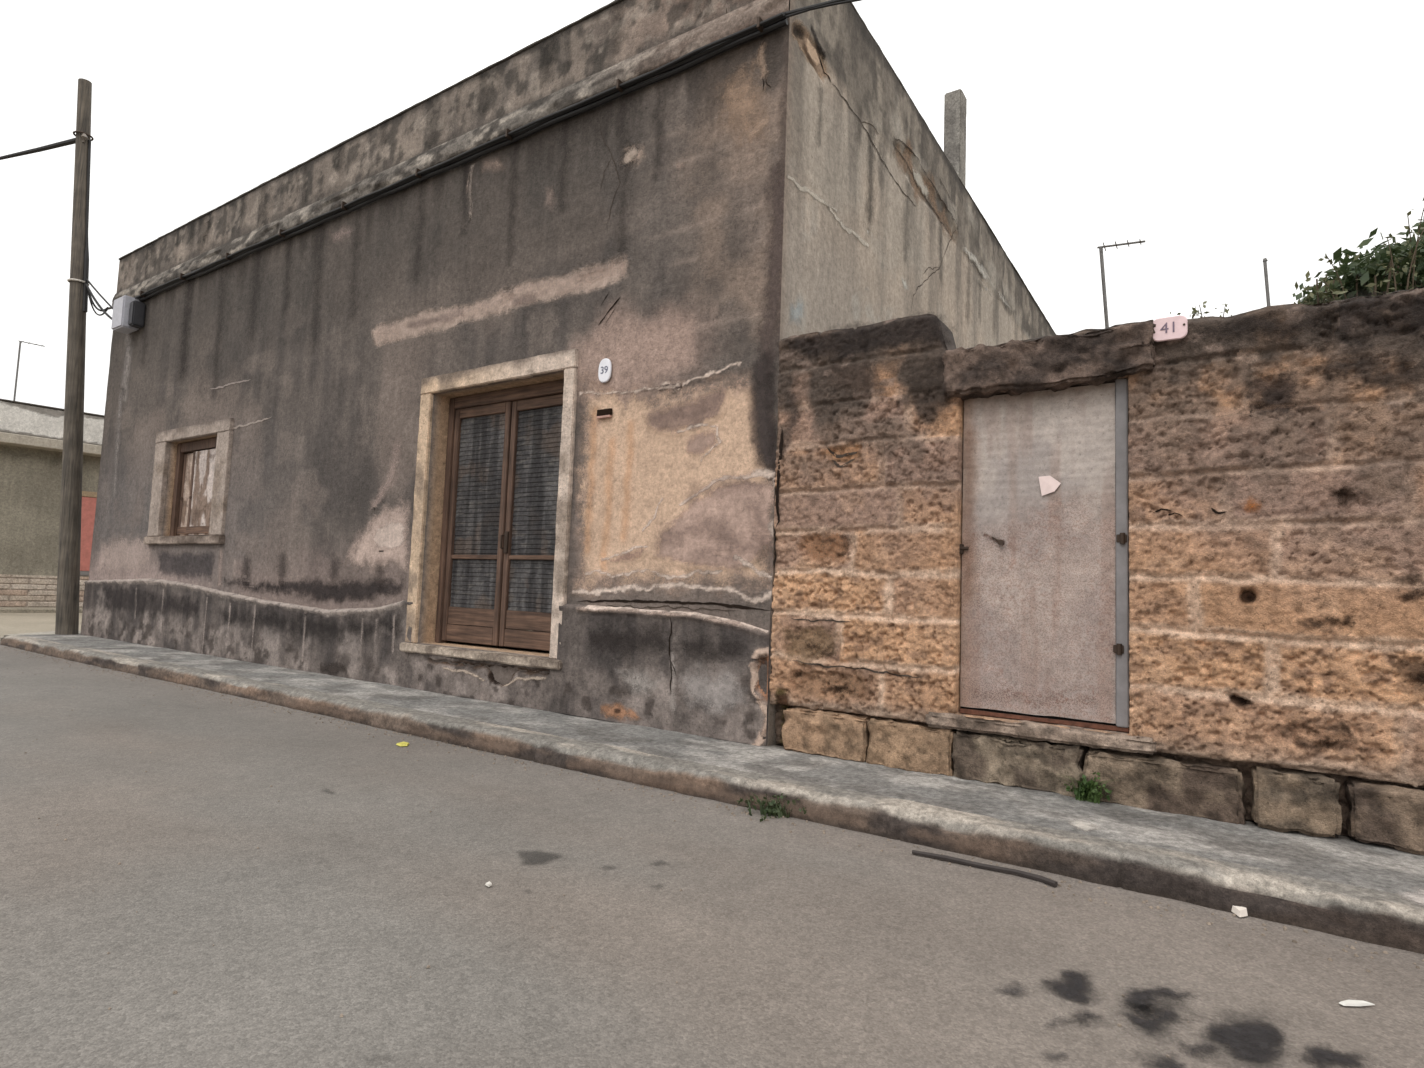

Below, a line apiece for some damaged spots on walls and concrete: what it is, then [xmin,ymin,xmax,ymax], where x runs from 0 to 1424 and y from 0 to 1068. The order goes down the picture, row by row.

crack [834,85,915,206]
crack [787,175,869,247]
flaking render [894,137,987,286]
flaking render [373,257,627,346]
crack [911,230,956,313]
flaking render [347,445,410,573]
flaking render [572,362,775,604]
water stain [88,550,402,660]
crack [578,599,851,709]
crack [792,660,919,678]